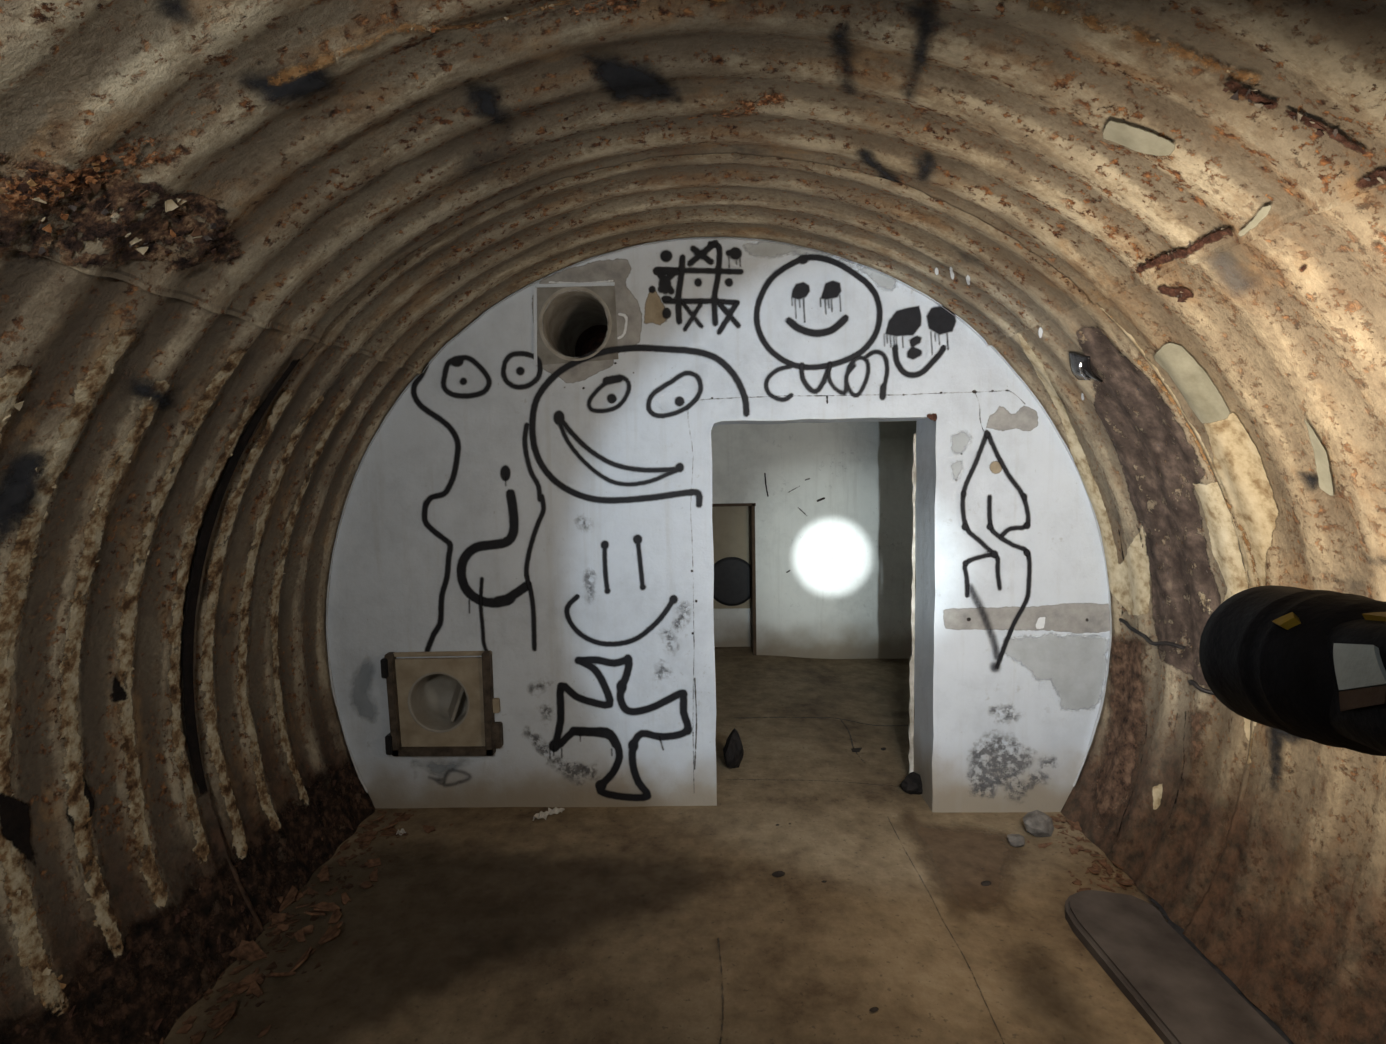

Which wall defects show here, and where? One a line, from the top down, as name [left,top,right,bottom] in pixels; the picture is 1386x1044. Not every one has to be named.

corrosion [0,136,243,272]
peeling [943,306,1279,710]
corrosion [1137,359,1260,587]
leakage [971,737,1054,799]
corrosion [1094,636,1146,826]
peeling [1152,784,1163,810]
peeling [1243,717,1257,764]